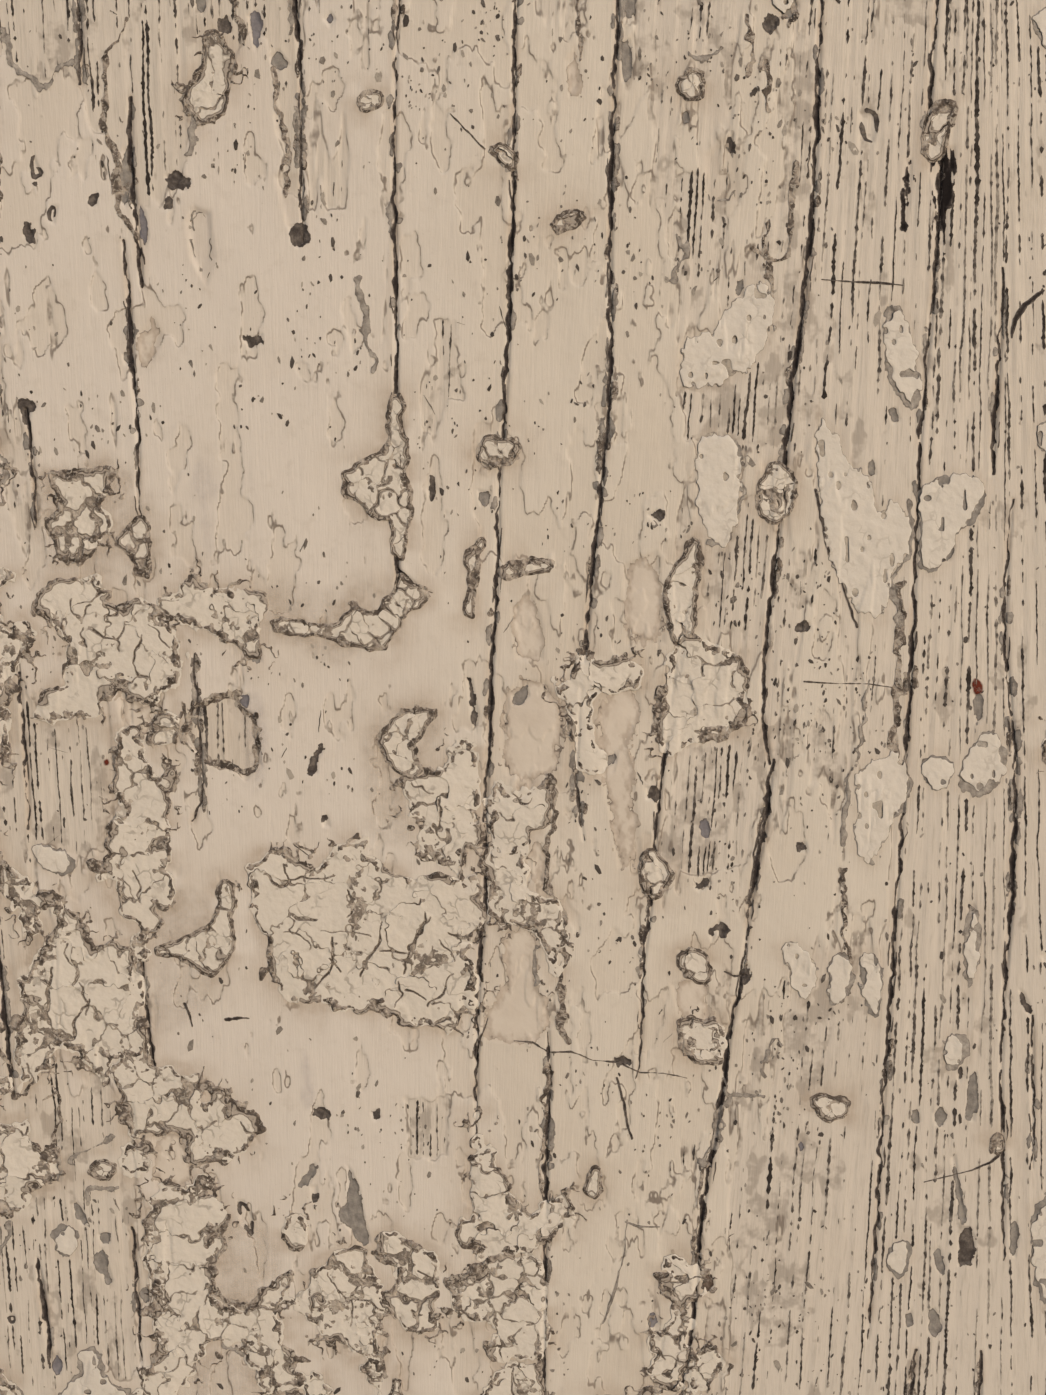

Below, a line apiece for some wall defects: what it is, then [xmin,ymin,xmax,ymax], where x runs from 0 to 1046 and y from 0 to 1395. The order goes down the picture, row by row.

peeling [762,0,797,35]
peeling [22,205,56,244]
peeling [679,279,777,389]
peeling [883,305,923,422]
peeling [815,418,986,619]
crack [473,0,686,1395]
crack [680,0,948,1395]
peeling [854,694,1008,864]
peeling [0,393,798,1395]
peeling [781,941,884,1018]
peeling [942,1033,979,1121]
peeling [933,1153,977,1275]